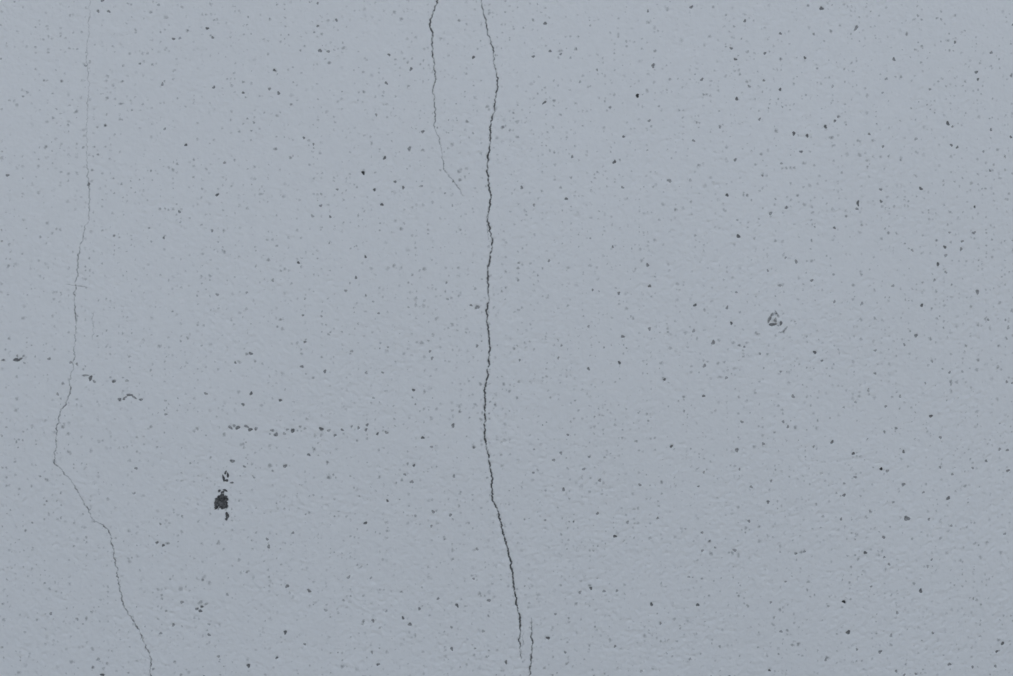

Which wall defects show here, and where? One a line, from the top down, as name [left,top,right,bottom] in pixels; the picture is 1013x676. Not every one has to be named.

crack [429,1,438,88]
crack [482,7,534,674]